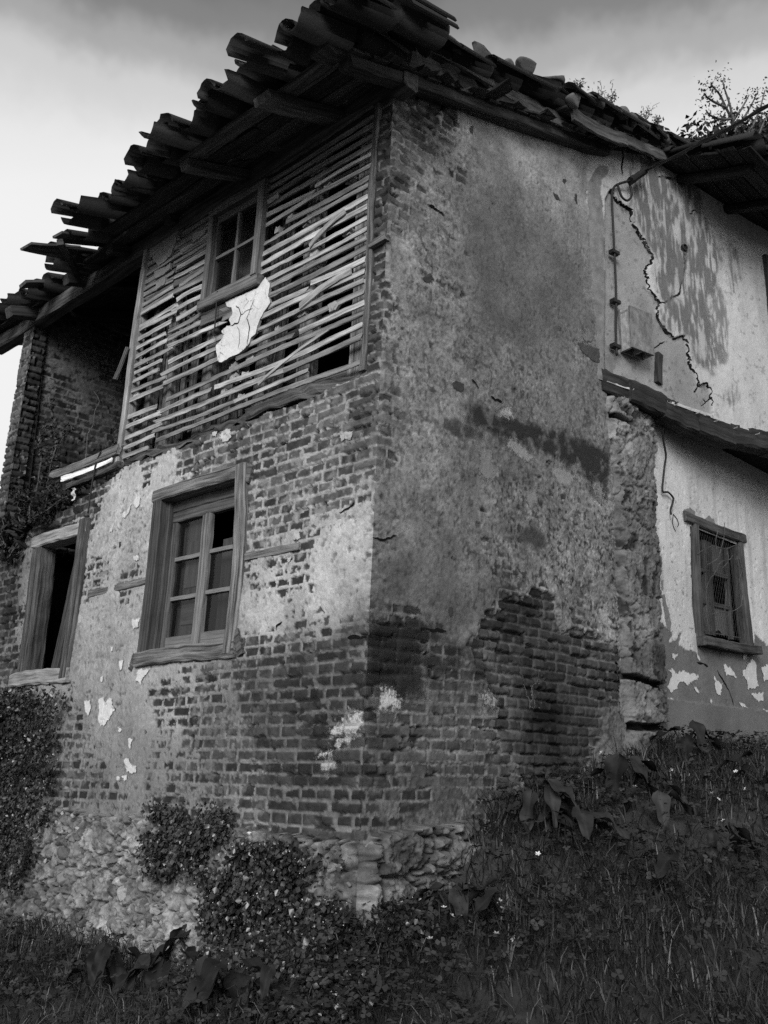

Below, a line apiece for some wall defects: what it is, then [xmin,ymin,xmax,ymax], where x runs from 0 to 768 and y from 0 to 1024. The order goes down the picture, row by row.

spalling [222,278,272,363]
crack [609,151,714,406]
damp [434,406,610,499]
peeling [135,668,150,685]
flaking render [148,668,222,724]
peeling [658,627,768,710]
peeling [84,697,136,781]